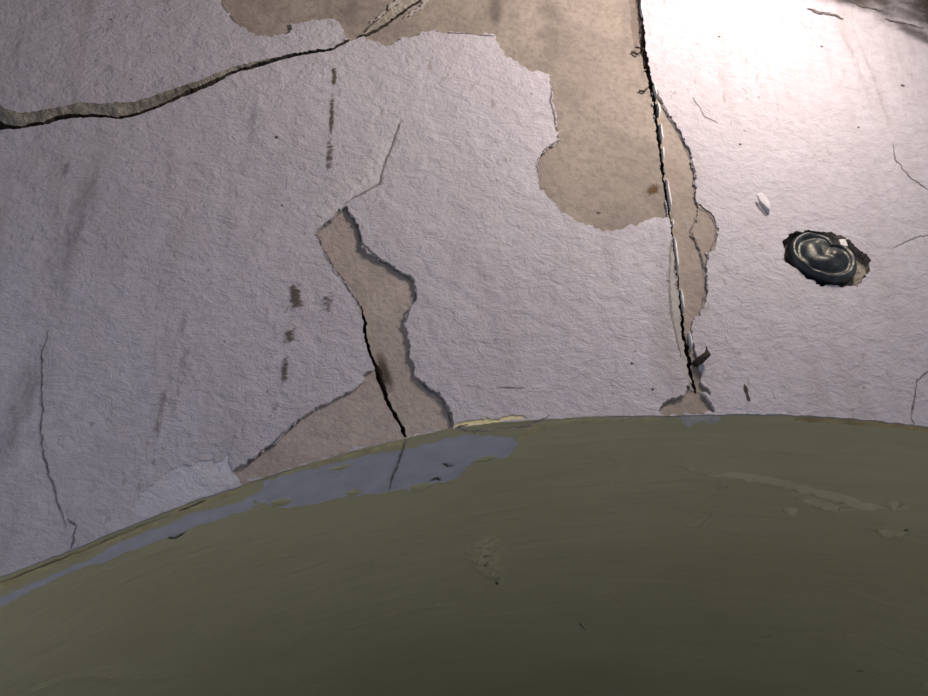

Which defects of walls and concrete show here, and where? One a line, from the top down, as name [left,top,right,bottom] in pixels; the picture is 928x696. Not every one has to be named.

crack [0,0,429,130]
flaking render [0,0,721,608]
crack [316,235,407,490]
crack [635,0,696,394]
spalling [782,229,871,288]
crack [910,371,928,425]